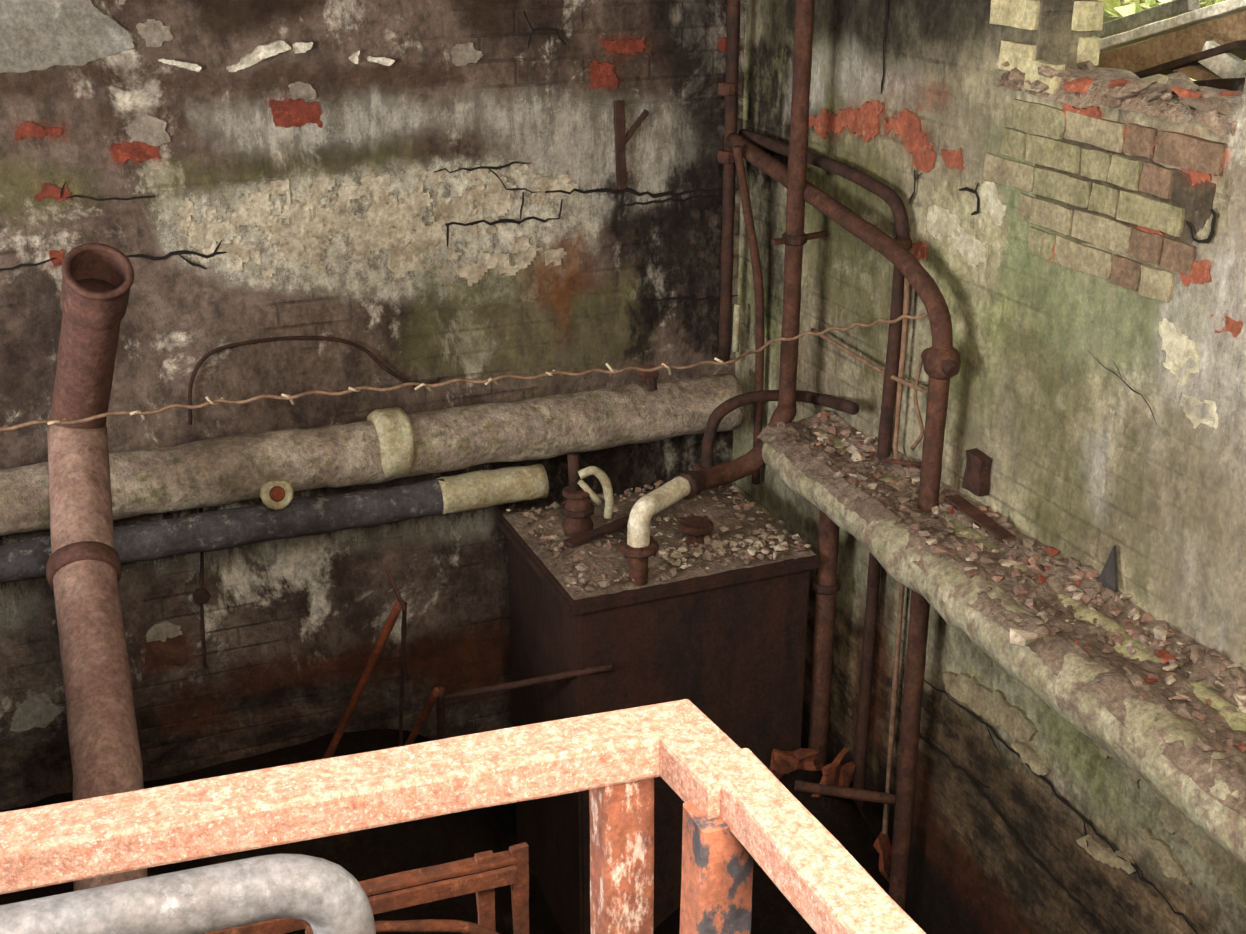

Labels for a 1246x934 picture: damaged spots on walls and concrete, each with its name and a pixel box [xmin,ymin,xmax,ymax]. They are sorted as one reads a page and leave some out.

crack [0,257,55,271]
flaking render [34,183,72,202]
flaking render [101,111,162,164]
crack [126,240,226,270]
spalling [0,19,461,145]
damp [155,98,723,304]
crack [434,161,723,247]
flaking render [809,67,1234,303]
peeling [1158,318,1219,429]
crack [920,679,1199,934]